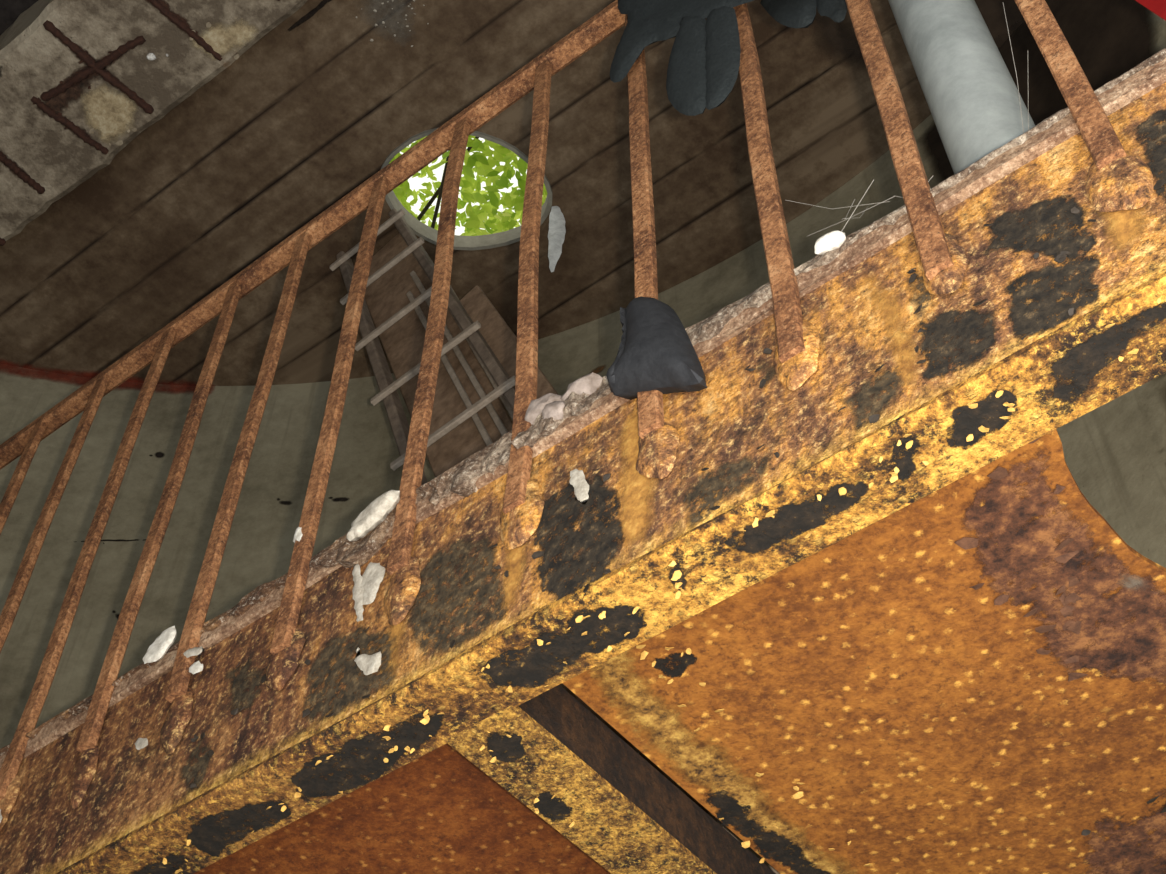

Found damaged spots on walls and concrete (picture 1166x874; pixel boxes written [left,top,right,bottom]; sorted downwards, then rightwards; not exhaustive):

corrosion [1105,209,1141,248]
corrosion [0,361,98,385]
corrosion [116,378,196,393]
corrosion [621,412,652,544]
corrosion [502,545,524,606]
corrosion [593,645,851,874]